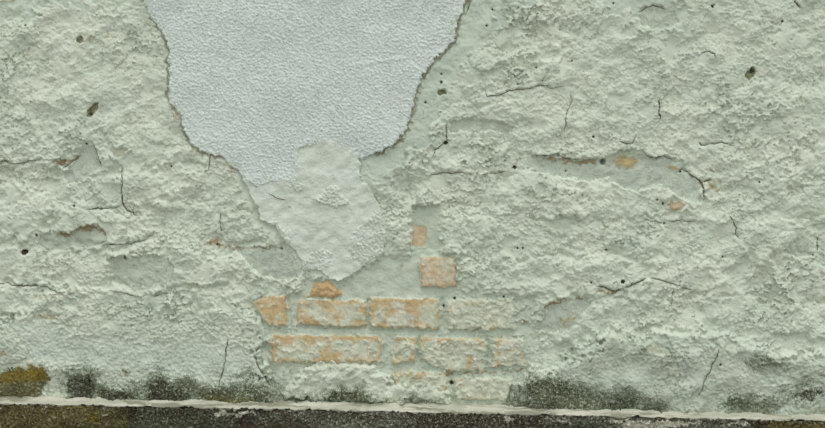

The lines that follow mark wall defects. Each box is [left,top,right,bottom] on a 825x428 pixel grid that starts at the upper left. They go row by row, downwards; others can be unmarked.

flaking render [449,118,513,134]
crack [89,170,139,217]
flaking render [527,149,702,210]
crack [619,135,712,201]
crack [0,282,62,295]
spalling [223,138,591,405]
damp [56,365,785,428]
damp [785,376,823,404]